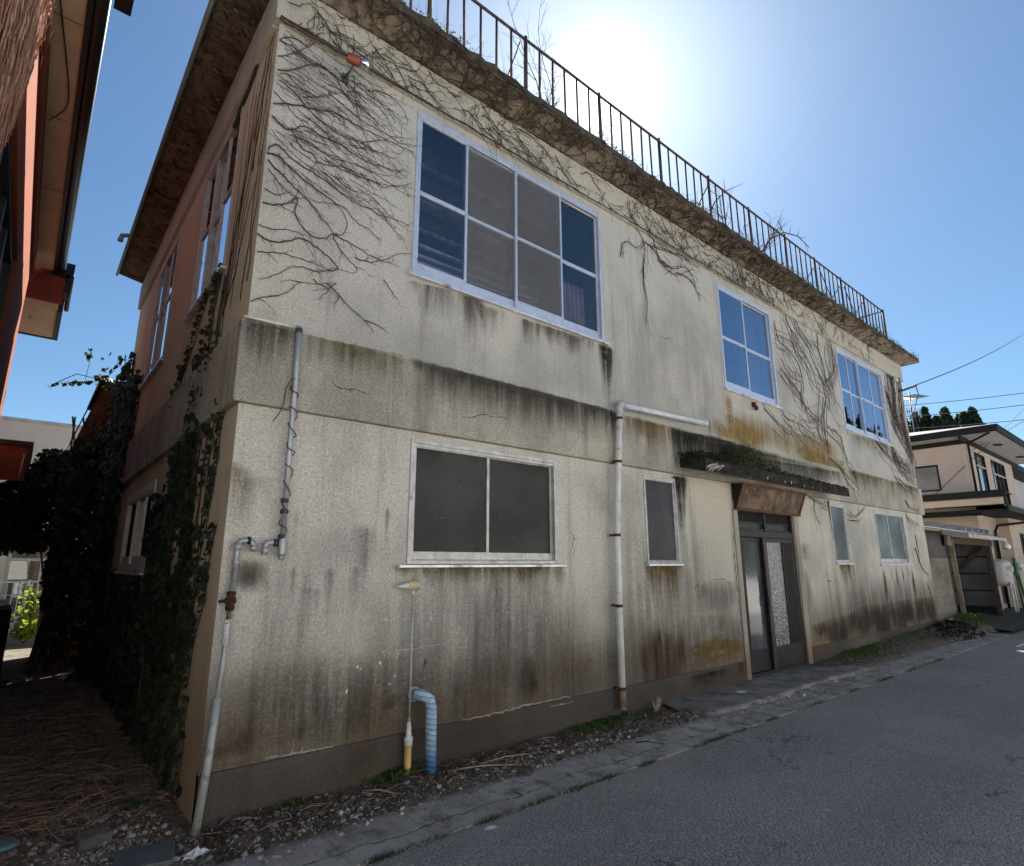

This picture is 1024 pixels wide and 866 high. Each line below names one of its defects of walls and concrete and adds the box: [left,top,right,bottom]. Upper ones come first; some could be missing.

damp [600,345,612,382]
damp [417,361,615,421]
crack [463,696,573,720]